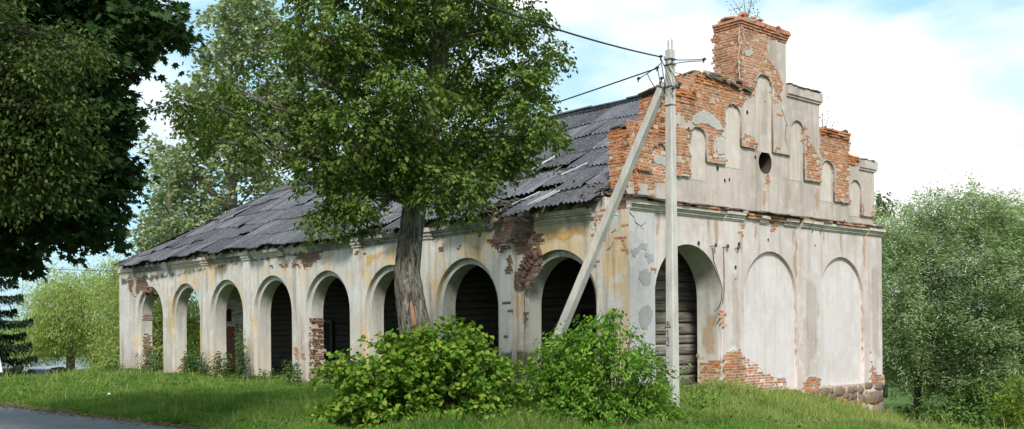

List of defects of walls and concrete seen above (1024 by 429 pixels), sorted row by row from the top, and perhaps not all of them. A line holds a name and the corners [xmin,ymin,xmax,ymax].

flaking render [487,23,784,290]
flaking render [800,126,875,217]
flaking render [127,278,149,296]
flaking render [270,251,324,271]
flaking render [142,314,154,370]
flaking render [294,318,327,381]
flaking render [696,349,788,391]
flaking render [802,375,823,394]